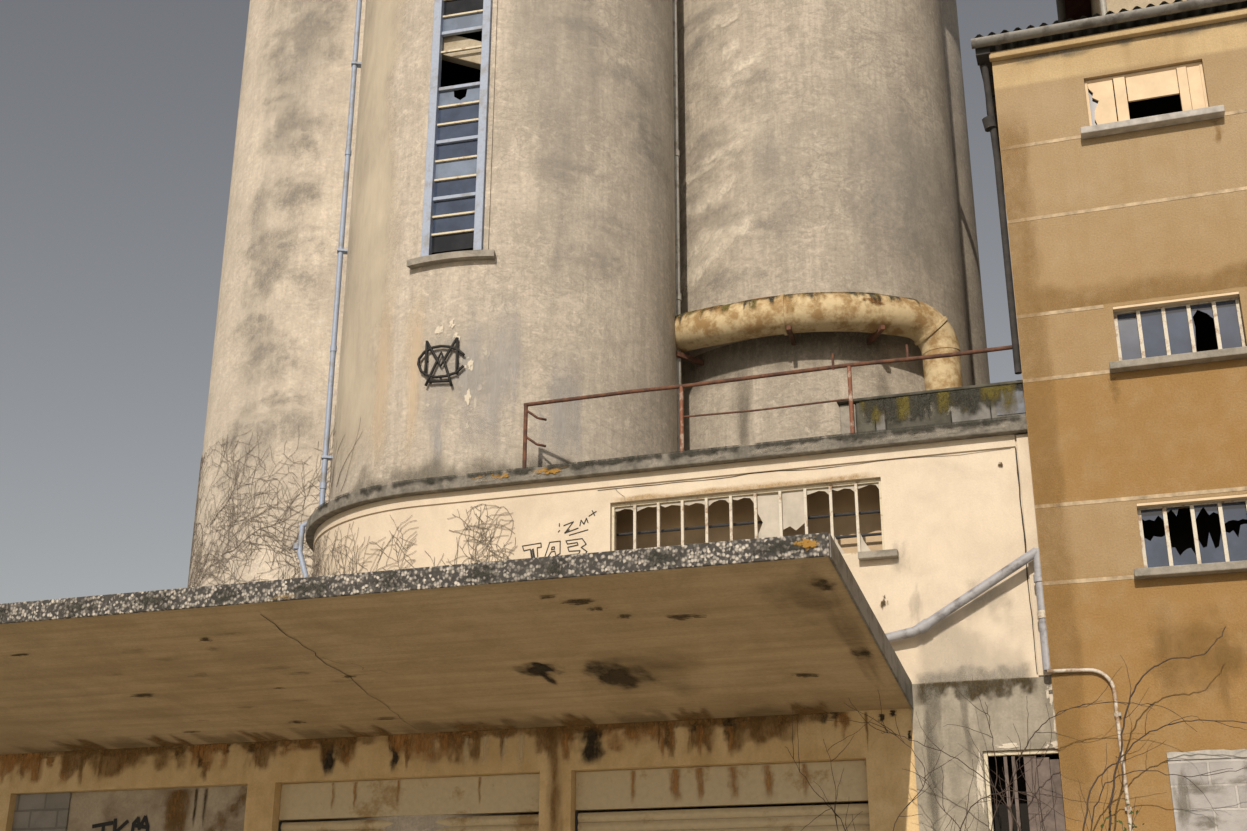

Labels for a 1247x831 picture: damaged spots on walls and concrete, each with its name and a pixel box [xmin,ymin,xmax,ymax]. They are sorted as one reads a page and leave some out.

water stain [691,332,879,388]
water stain [738,395,748,444]
water stain [0,736,373,831]
water stain [388,712,849,828]